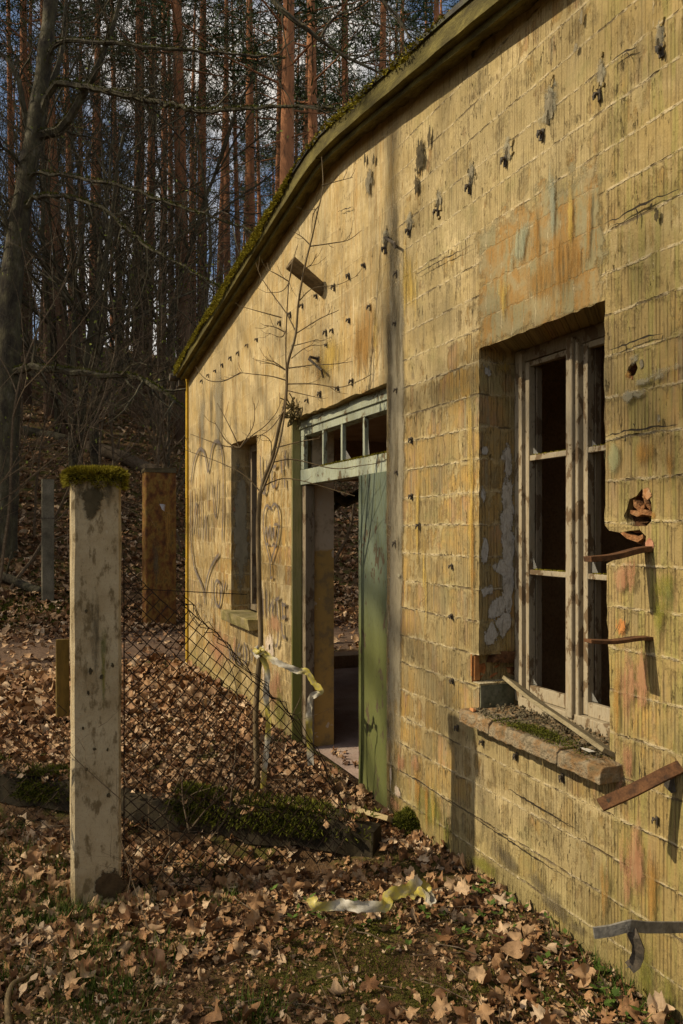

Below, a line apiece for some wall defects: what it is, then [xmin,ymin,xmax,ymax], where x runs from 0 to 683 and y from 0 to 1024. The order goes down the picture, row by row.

crack [606,189,679,225]
corrosion [528,195,592,295]
spalling [622,356,643,403]
spalling [620,487,655,548]
peeling [470,443,515,684]